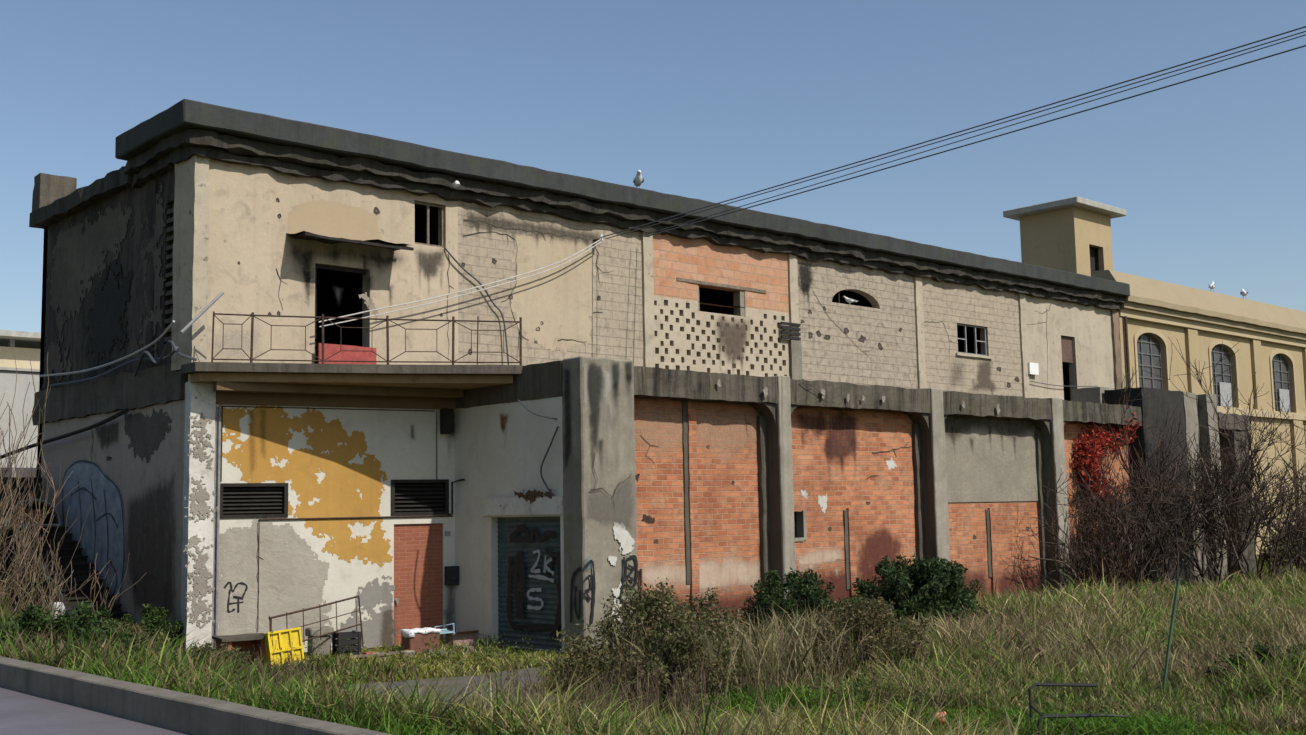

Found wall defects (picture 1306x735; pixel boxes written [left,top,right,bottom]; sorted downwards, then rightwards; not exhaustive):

flaking render [124,408,172,463]
leakage [589,362,632,458]
peeling [183,404,393,640]
leakage [589,480,634,525]
spalling [612,582,622,626]
spalling [608,522,636,566]
leakage [642,560,762,627]
leakage [797,530,899,607]